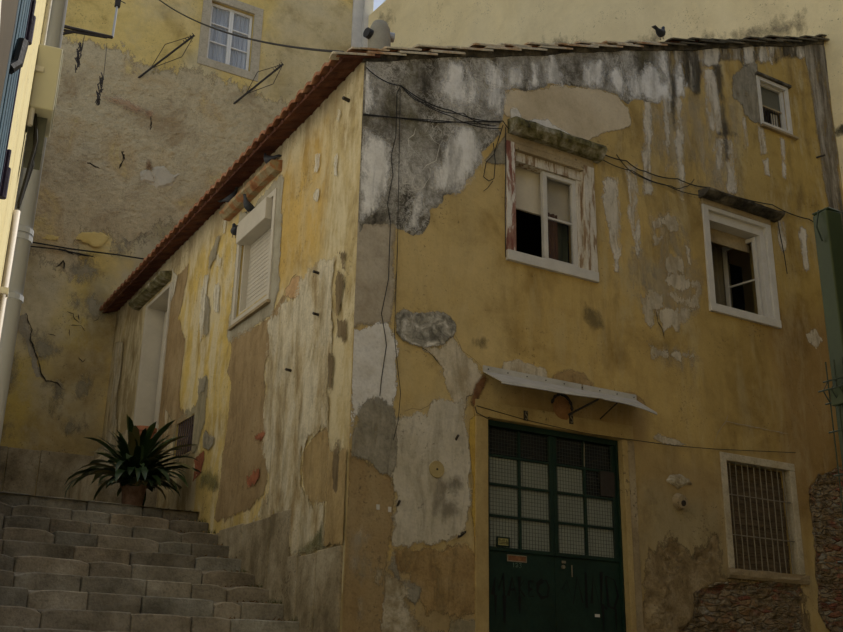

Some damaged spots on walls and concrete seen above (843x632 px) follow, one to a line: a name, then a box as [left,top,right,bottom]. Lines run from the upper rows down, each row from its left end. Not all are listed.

spalling [29,35,290,283]
peeling [335,44,843,342]
damp [798,227,809,272]
crack [27,312,99,390]
peeling [214,276,300,522]
flaking render [553,369,592,386]
peeling [806,329,823,349]
peeling [302,427,339,503]
peeling [375,336,483,632]
spalling [676,581,806,632]